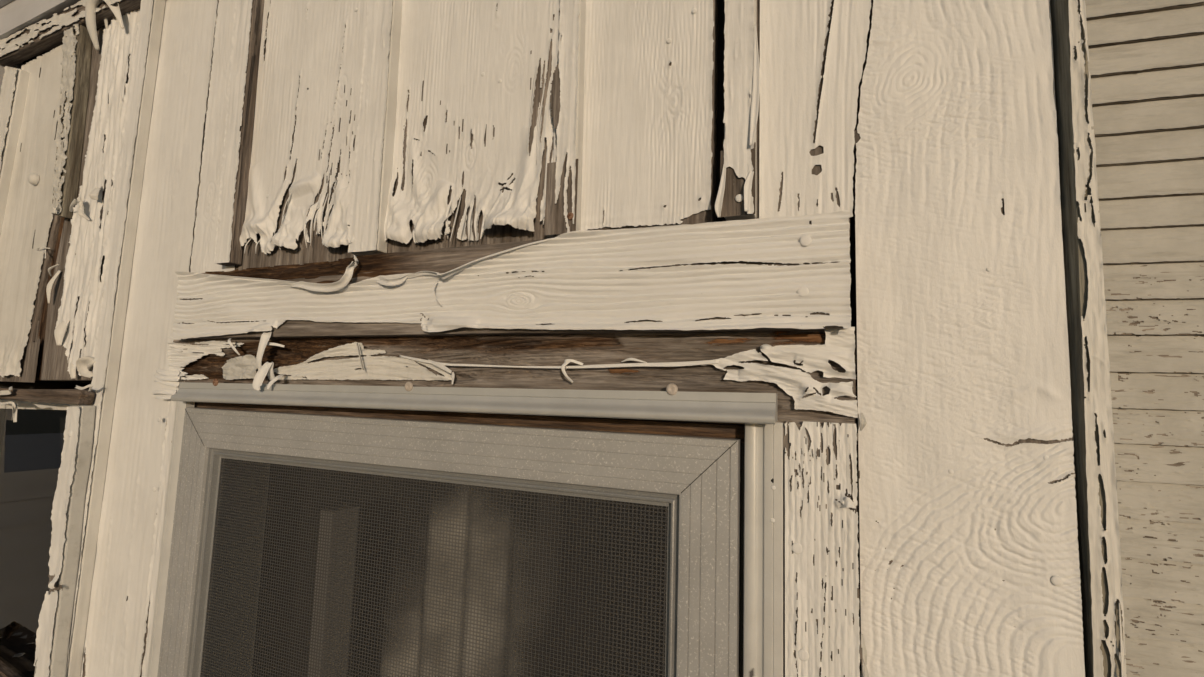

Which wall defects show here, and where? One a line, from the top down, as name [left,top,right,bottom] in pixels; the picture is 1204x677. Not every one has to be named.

peeling [175,0,760,306]
peeling [805,139,829,179]
peeling [854,128,866,146]
peeling [0,0,140,383]
peeling [1070,0,1204,677]
peeling [152,312,867,431]
crack [974,430,1076,487]
peeling [45,562,63,601]
peeling [34,644,43,677]